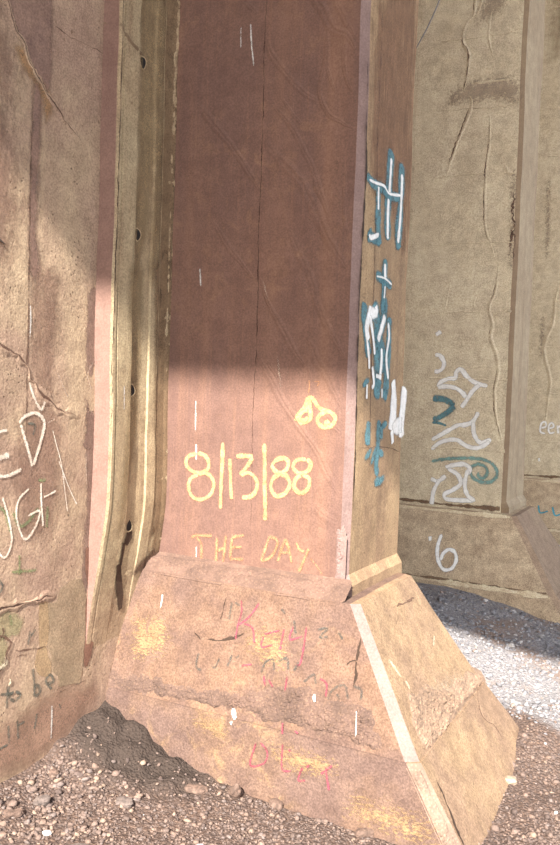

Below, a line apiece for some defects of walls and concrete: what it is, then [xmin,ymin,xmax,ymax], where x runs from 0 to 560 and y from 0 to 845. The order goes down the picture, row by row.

crack [0,0,85,434]
peeling [0,612,23,671]
crack [0,590,57,617]
crack [195,599,244,641]